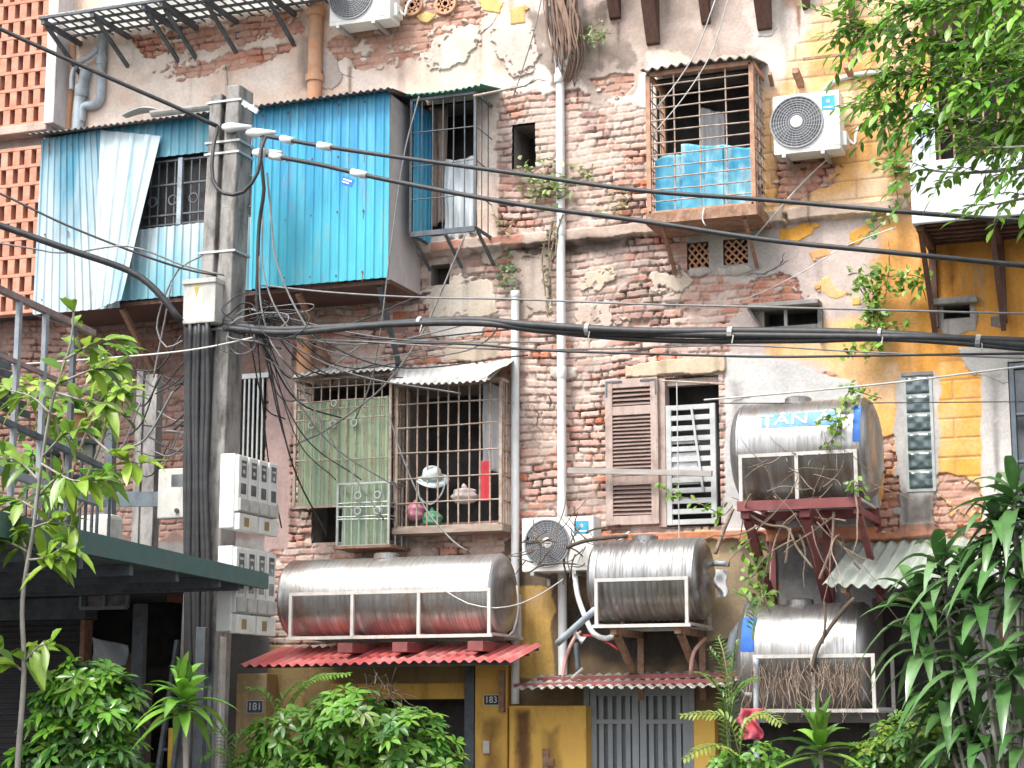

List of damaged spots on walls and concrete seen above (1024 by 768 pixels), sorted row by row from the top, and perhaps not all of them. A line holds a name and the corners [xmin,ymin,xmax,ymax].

spalling [131,11,305,82]
spalling [322,0,542,90]
spalling [591,73,634,100]
spalling [772,157,843,200]
spalling [750,273,821,303]
spalling [879,435,901,533]
spalling [933,473,984,539]